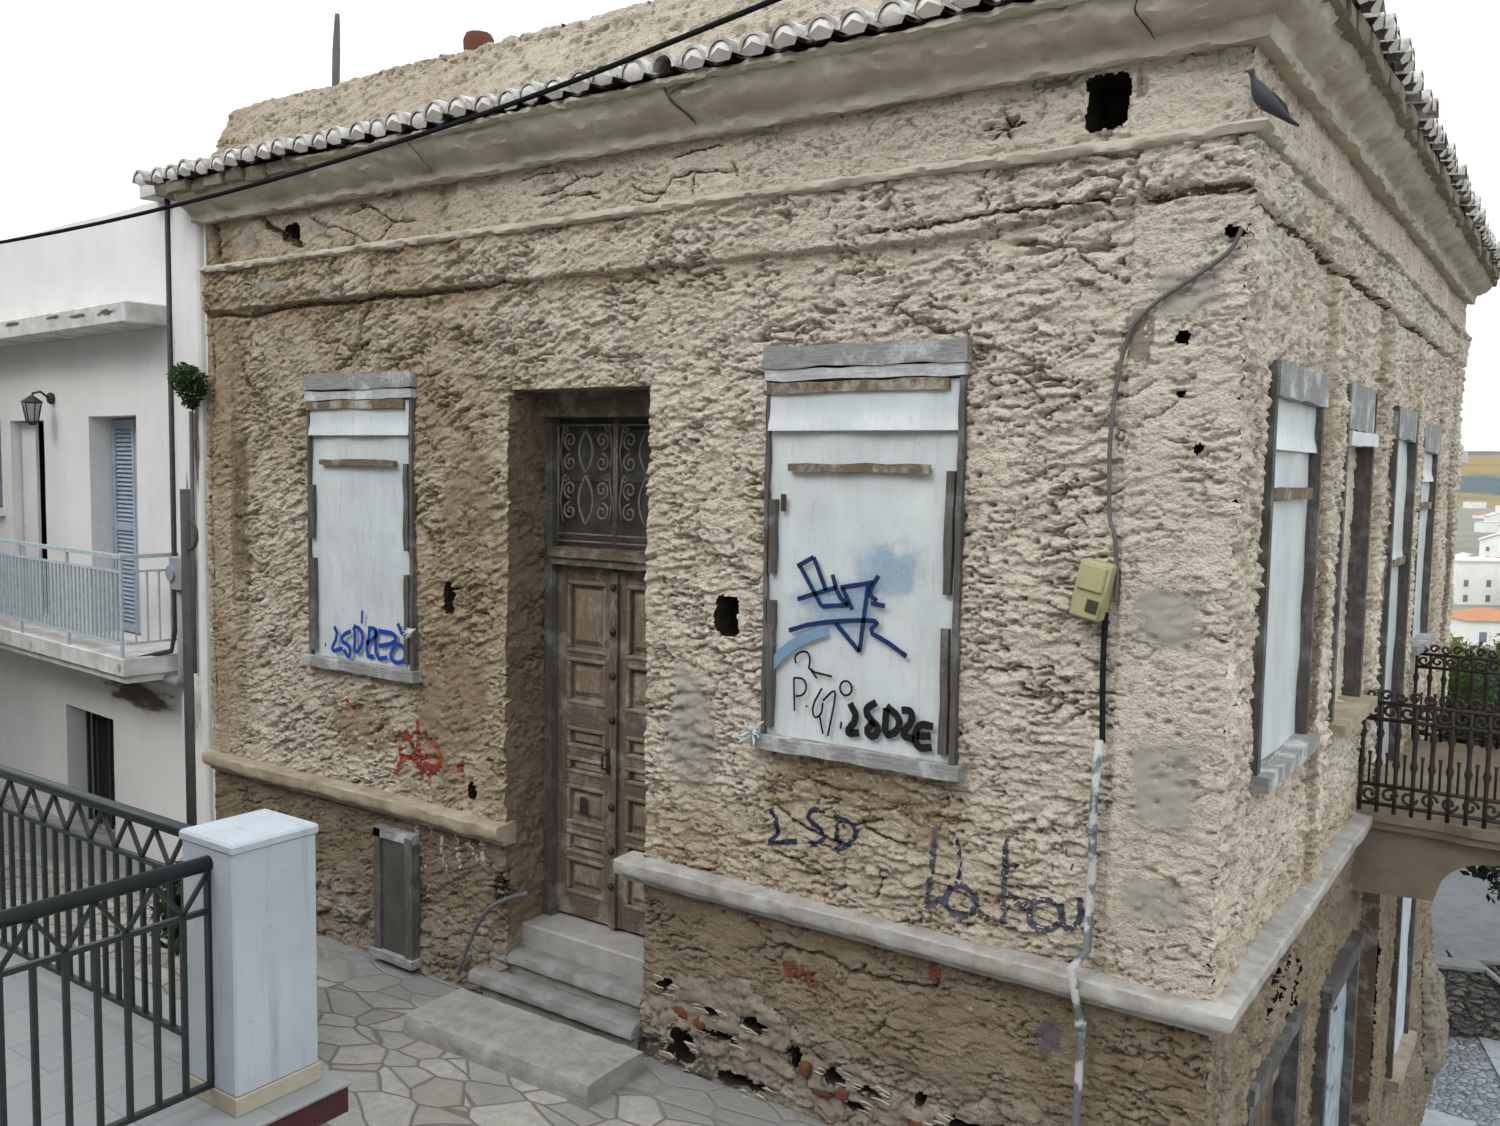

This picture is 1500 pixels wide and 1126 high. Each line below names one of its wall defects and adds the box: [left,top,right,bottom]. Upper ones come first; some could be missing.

crack [1134,0,1156,41]
crack [523,78,739,206]
crack [211,204,507,378]
spalling [649,972,987,1126]